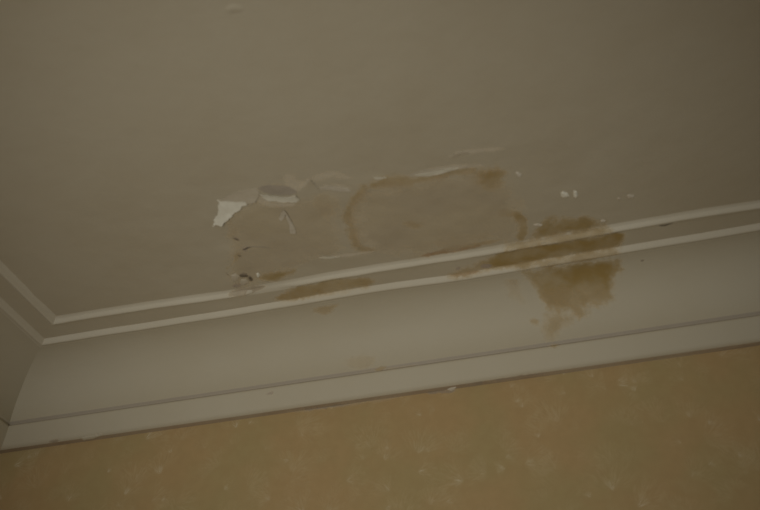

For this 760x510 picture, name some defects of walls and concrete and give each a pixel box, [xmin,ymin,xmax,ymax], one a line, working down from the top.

peeling [212,185,300,234]
damp [277,278,372,300]
damp [458,211,624,330]